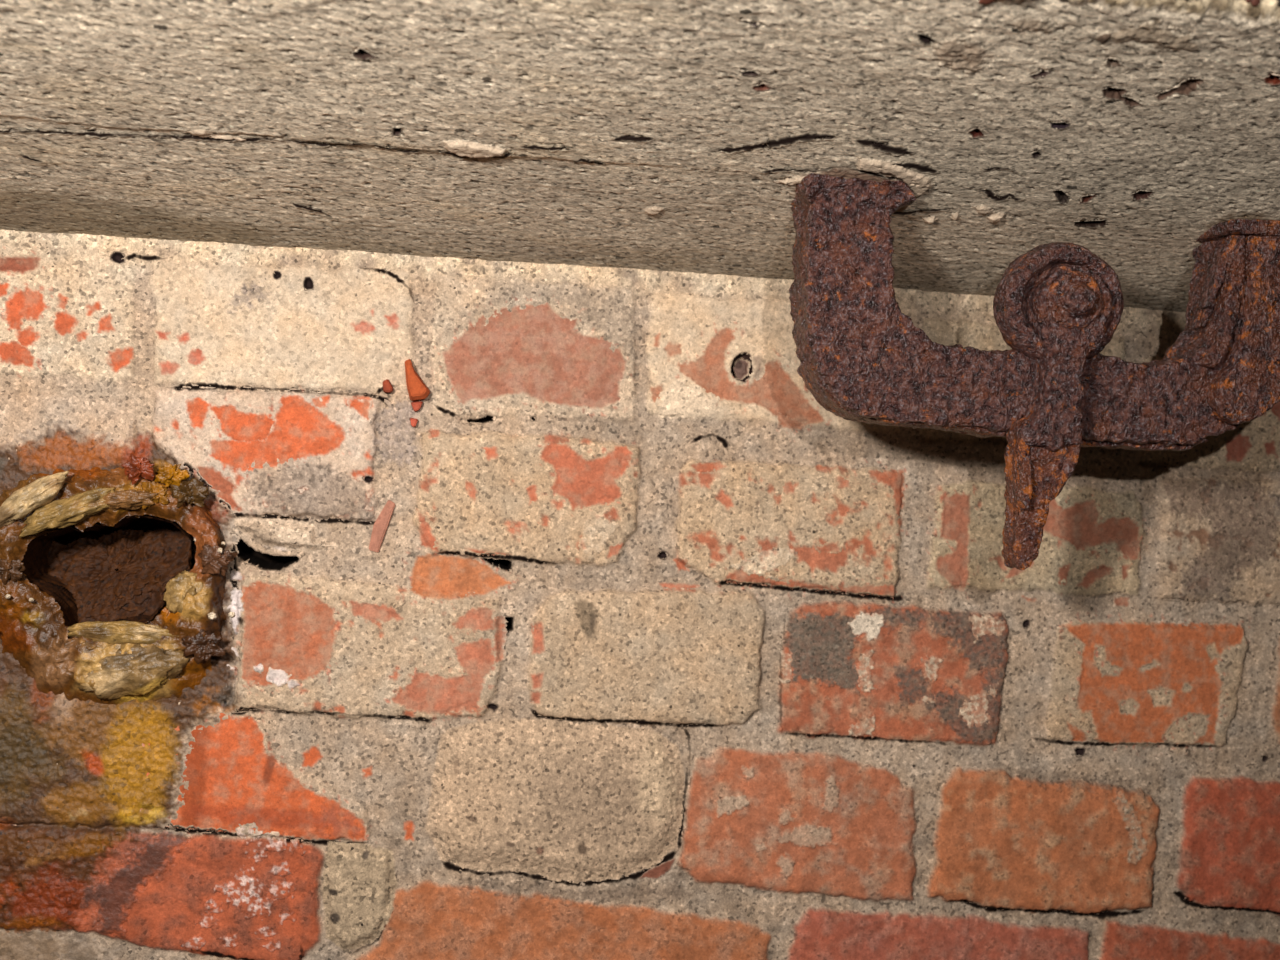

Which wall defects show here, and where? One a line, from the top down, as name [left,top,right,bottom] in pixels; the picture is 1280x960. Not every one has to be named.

crack [0,128,655,165]
corrosion [787,163,901,202]
crack [713,132,1027,216]
corrosion [1191,203,1280,425]
corrosion [1007,440,1081,509]
leakage [163,570,203,614]
corrosion [0,412,247,960]
leakage [67,620,191,700]